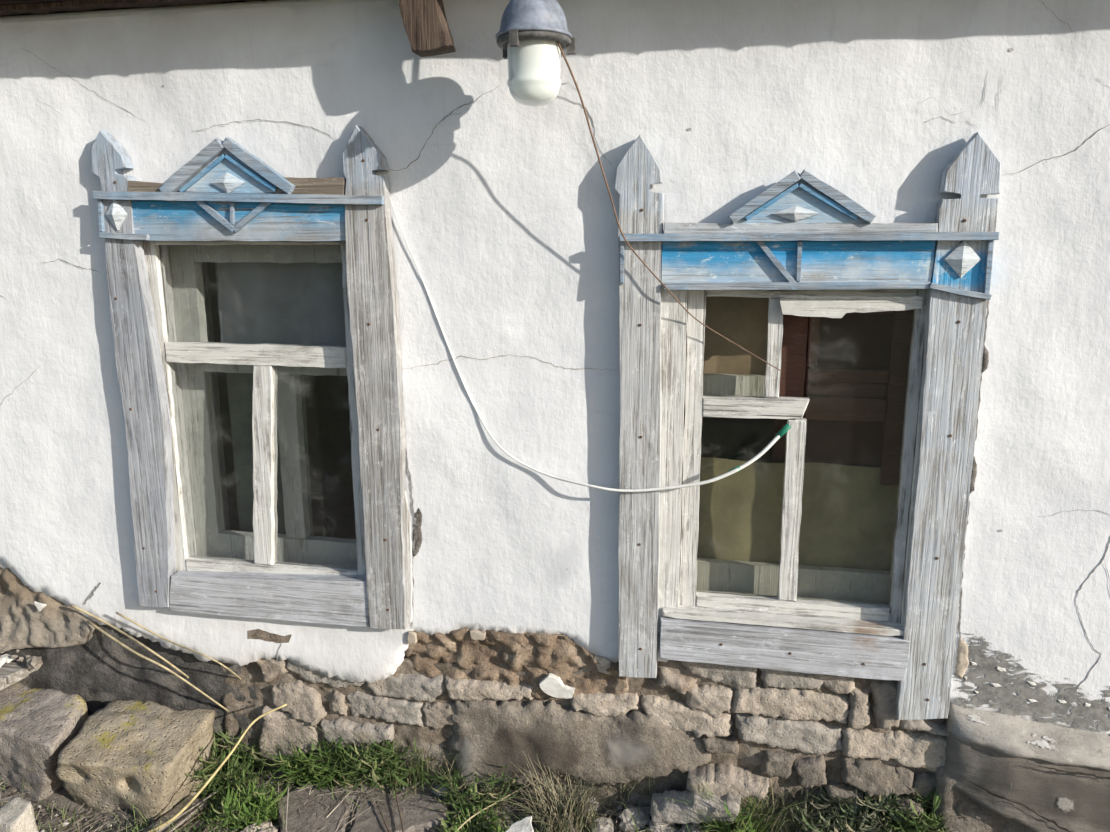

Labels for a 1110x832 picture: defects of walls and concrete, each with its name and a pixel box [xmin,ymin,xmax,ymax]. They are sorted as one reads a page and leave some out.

crack [390,85,500,172]
crack [557,82,612,165]
crack [1003,125,1110,176]
crack [407,354,609,370]
flaking render [975,300,989,441]
flaking render [964,457,977,558]
flaking render [0,562,97,671]
flaking render [406,450,629,700]
peeling [954,572,1110,732]
crack [1074,542,1110,694]